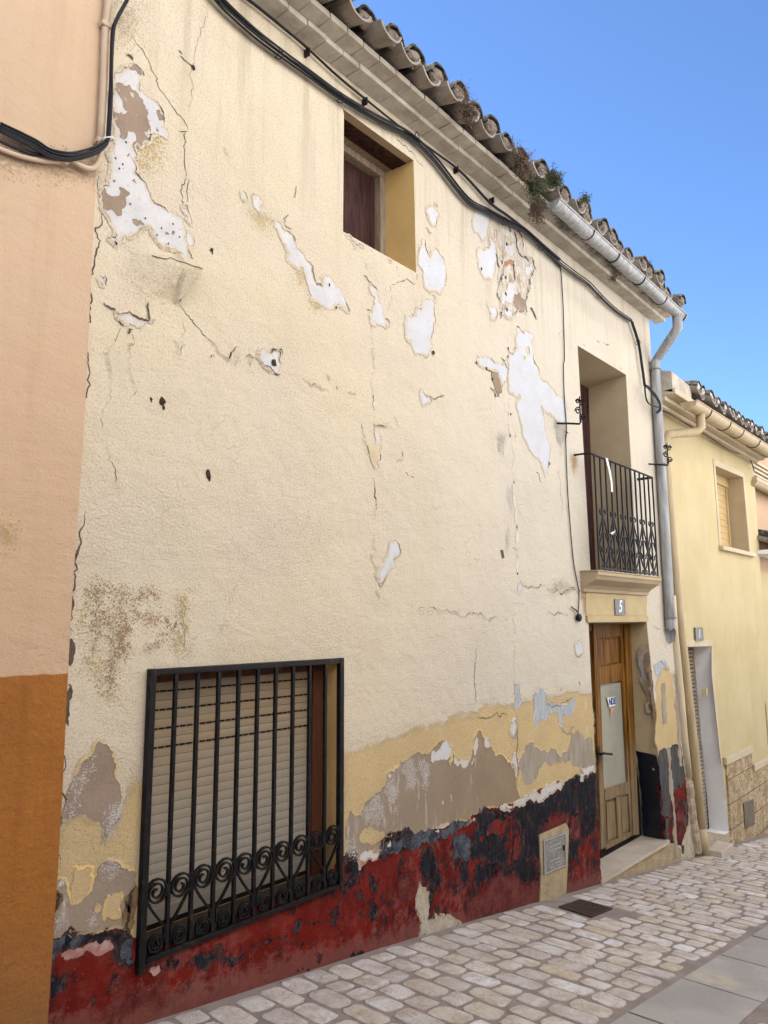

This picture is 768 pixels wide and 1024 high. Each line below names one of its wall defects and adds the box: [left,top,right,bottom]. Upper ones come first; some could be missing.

peeling [98,54,197,261]
crack [136,14,208,203]
crack [89,176,103,323]
crack [172,321,255,367]
peeling [240,189,352,315]
peeling [364,202,448,359]
peeling [472,204,568,478]
crack [66,514,85,726]
peeling [376,539,402,588]
peeling [636,644,668,724]
peeling [49,683,597,1024]
peeling [653,745,702,860]